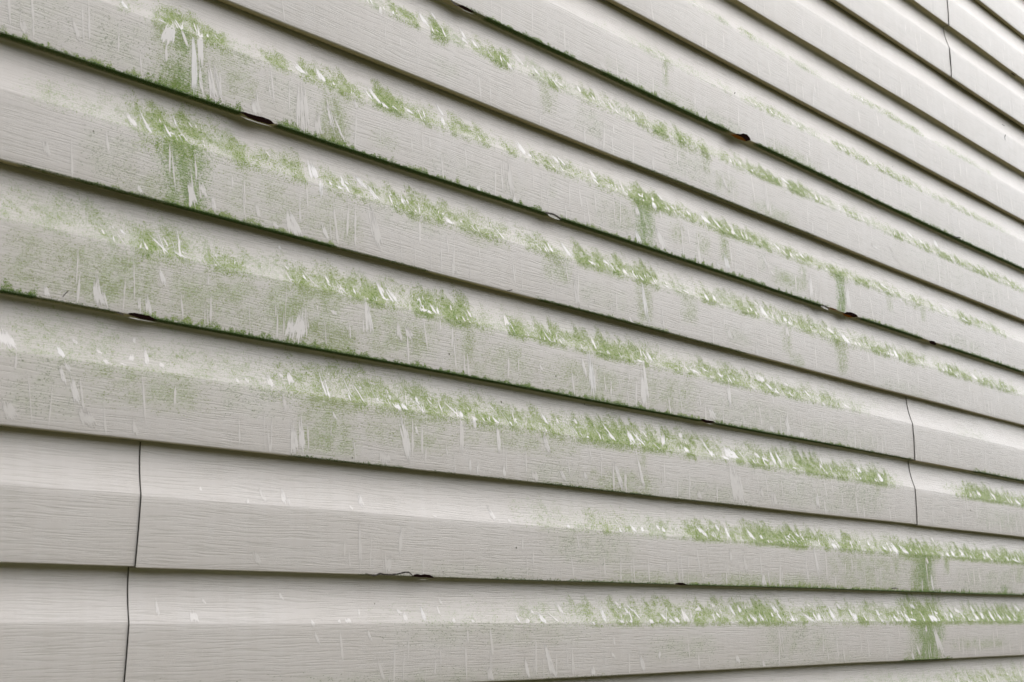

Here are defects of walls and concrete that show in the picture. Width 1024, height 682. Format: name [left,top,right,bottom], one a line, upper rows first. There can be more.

water stain [158,19,223,104]
water stain [126,110,216,211]
water stain [289,64,431,171]
water stain [266,152,504,279]
water stain [565,167,827,304]
water stain [275,265,398,344]
water stain [397,295,479,375]
water stain [571,338,735,422]
water stain [318,371,627,492]
water stain [627,430,692,490]
water stain [703,442,797,504]
water stain [592,525,1024,664]